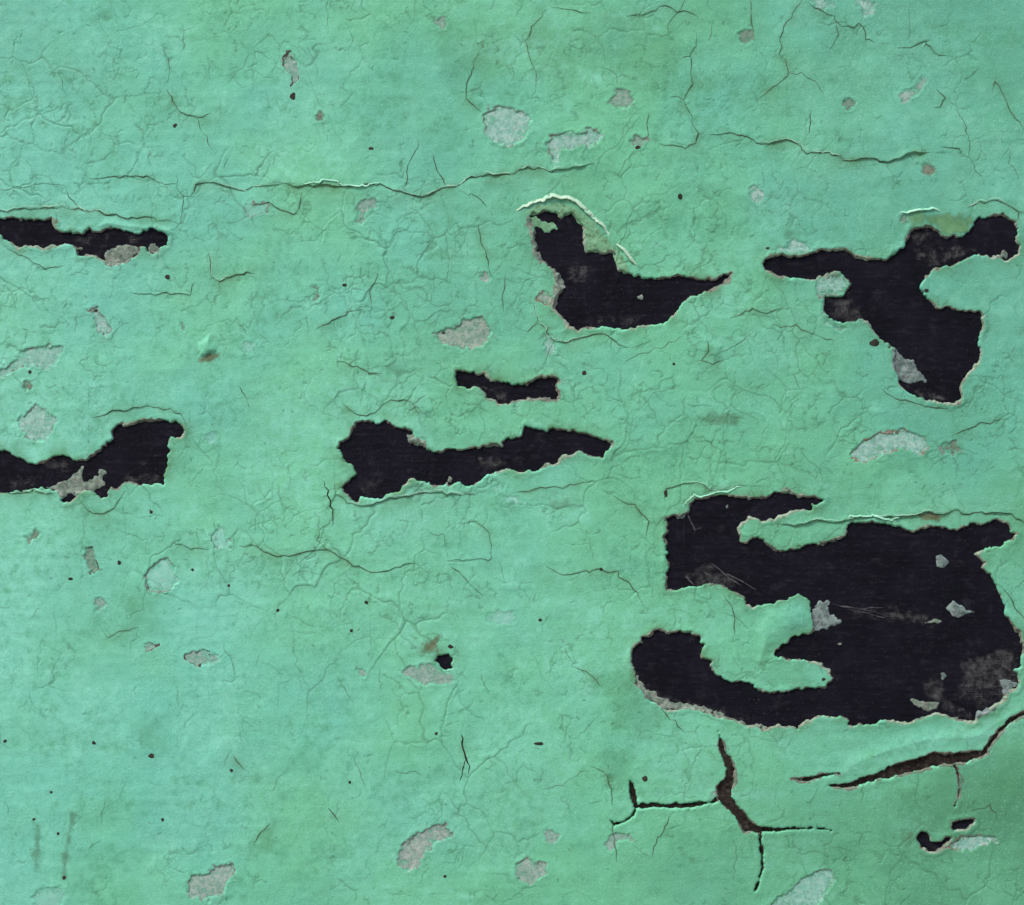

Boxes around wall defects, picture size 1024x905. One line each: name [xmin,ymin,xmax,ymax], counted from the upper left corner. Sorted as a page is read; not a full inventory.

peeling [0,215,168,267]
peeling [517,193,733,332]
peeling [762,207,1021,406]
peeling [454,369,561,406]
peeling [0,417,185,503]
peeling [338,420,614,505]
spalling [851,428,963,463]
peeling [630,486,1024,732]
crack [790,710,1024,820]
spalling [396,822,454,873]
crack [542,738,824,891]
peeling [916,817,998,854]